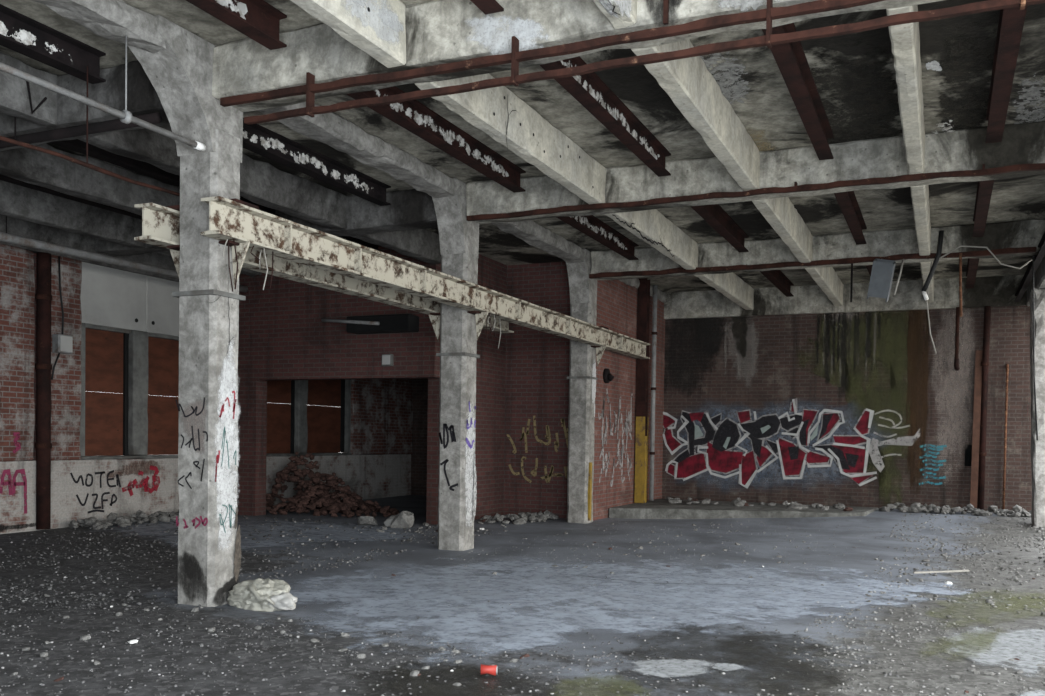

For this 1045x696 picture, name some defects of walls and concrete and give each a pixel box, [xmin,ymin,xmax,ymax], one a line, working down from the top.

leakage [935,35,993,132]
leakage [664,316,748,395]
leakage [817,311,880,391]